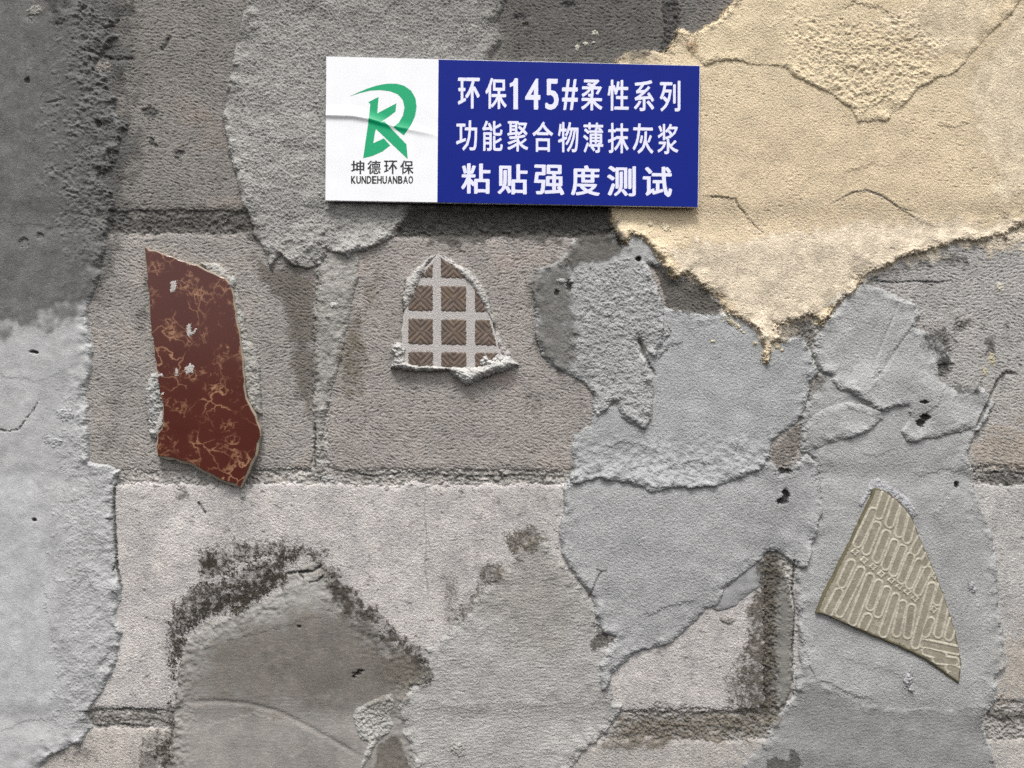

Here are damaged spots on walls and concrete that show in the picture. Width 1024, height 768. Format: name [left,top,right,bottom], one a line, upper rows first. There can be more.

spalling [651,264,721,315]
spalling [779,320,816,354]
spalling [974,473,1024,486]
spalling [590,630,614,651]